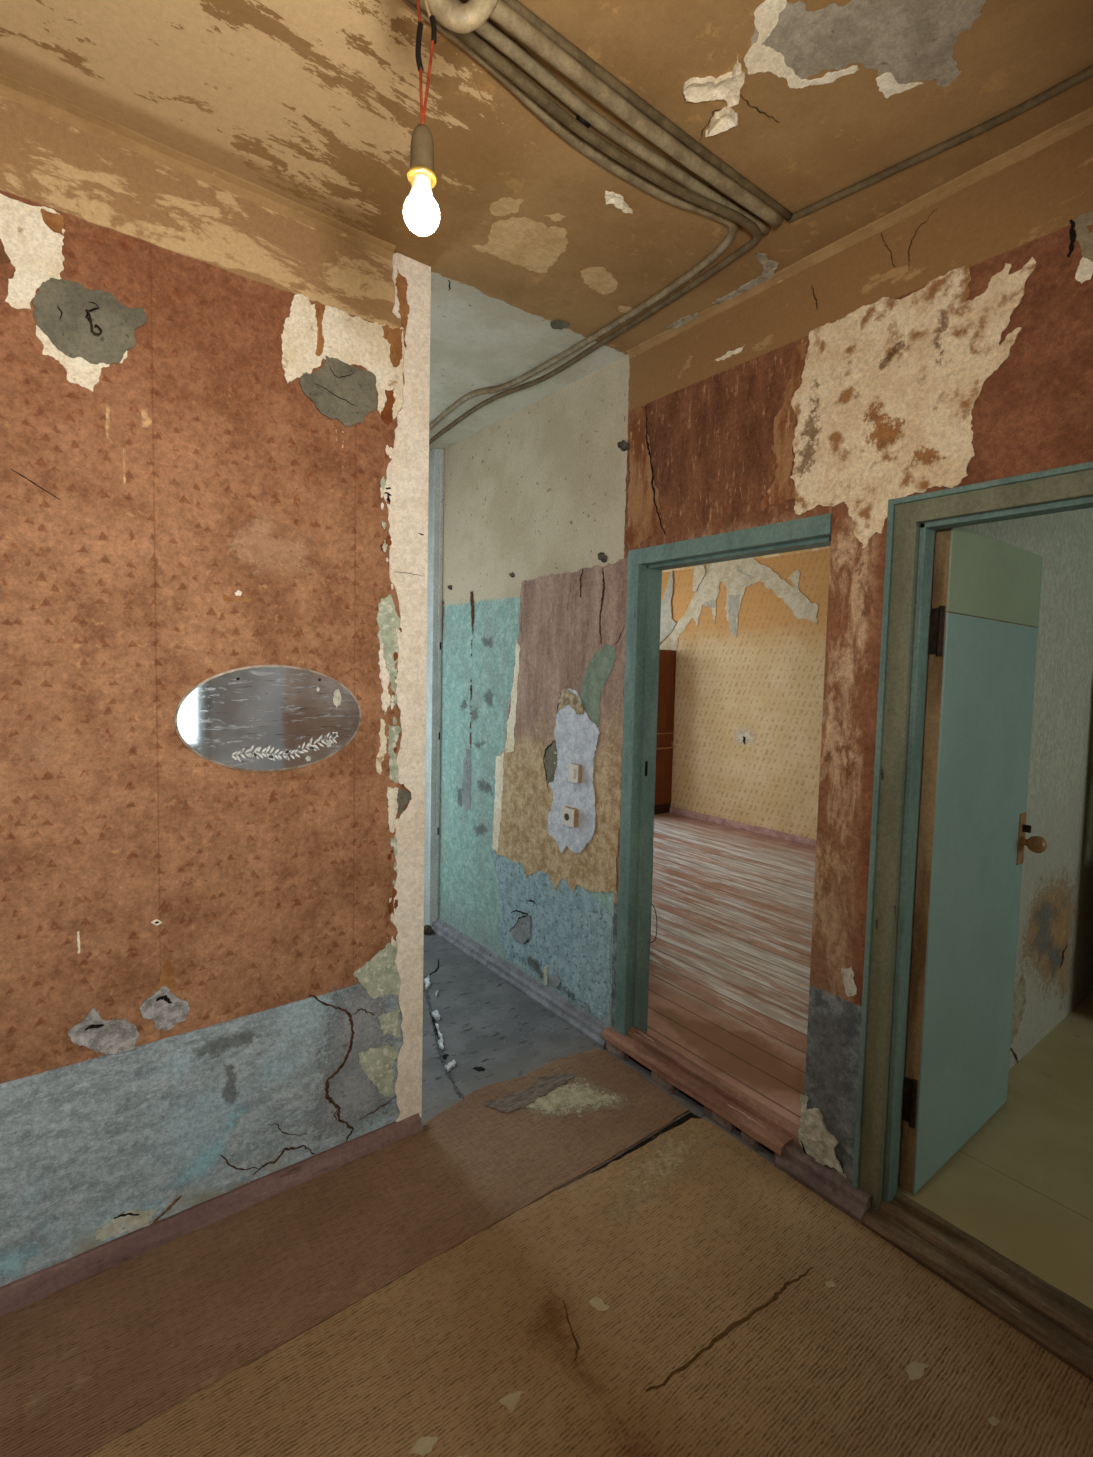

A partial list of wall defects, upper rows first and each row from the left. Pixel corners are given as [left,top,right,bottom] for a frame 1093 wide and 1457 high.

peeling [683,0,987,138]
flaking render [36,325,128,392]
peeling [381,269,410,367]
flaking render [790,257,1036,549]
flaking render [660,557,818,651]
flaking render [311,584,412,1140]
peeling [457,640,616,1021]
flaking render [67,957,190,1056]
leakage [1011,872,1077,1044]
crack [217,995,396,1176]
crack [563,1300,580,1362]
crack [645,1267,813,1392]